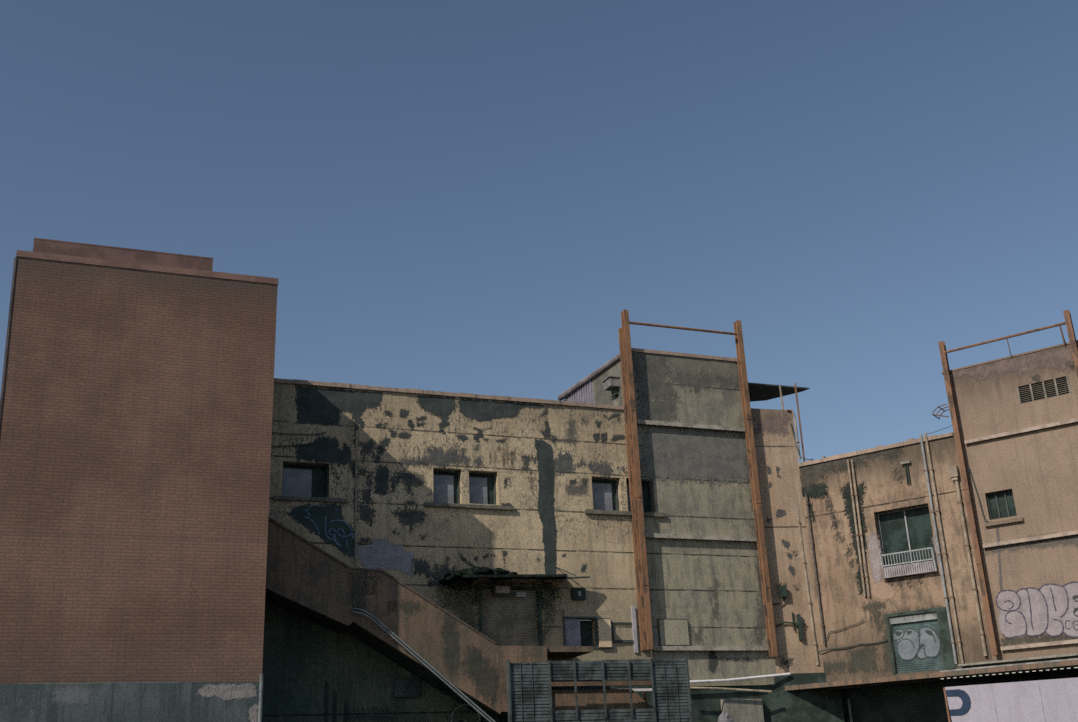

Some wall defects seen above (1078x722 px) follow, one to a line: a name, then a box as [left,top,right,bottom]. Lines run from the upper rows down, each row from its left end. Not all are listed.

peeling [294,385,544,546]
peeling [411,551,508,588]
water stain [800,447,923,676]